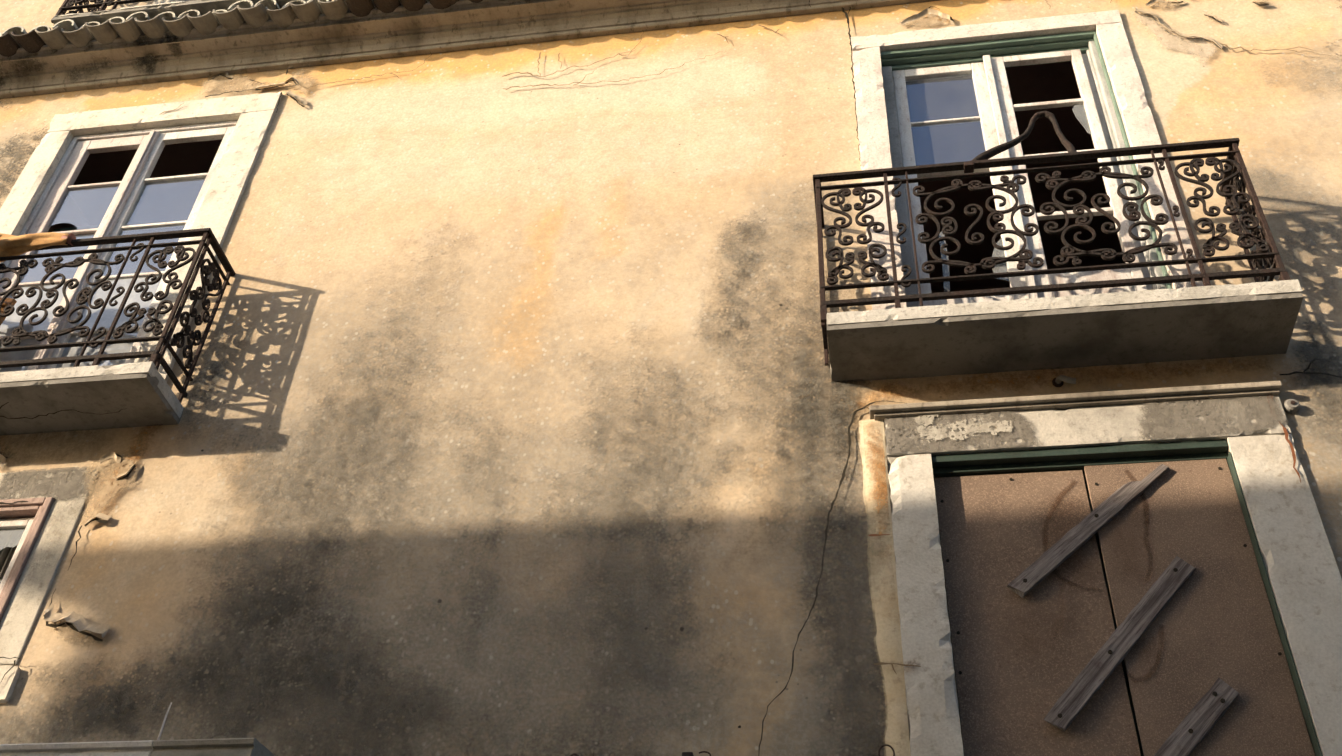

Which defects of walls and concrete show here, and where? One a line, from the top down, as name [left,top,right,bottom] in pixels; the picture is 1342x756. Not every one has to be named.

flaking render [202,64,312,112]
crack [502,30,730,90]
crack [809,0,861,167]
flaking render [1134,0,1223,57]
leakage [0,129,48,196]
crack [0,402,122,419]
peeling [913,415,1013,443]
crack [1267,359,1342,483]
flaking render [68,451,137,570]
leakage [0,390,450,756]
crack [759,401,903,751]
flaking render [43,589,110,644]